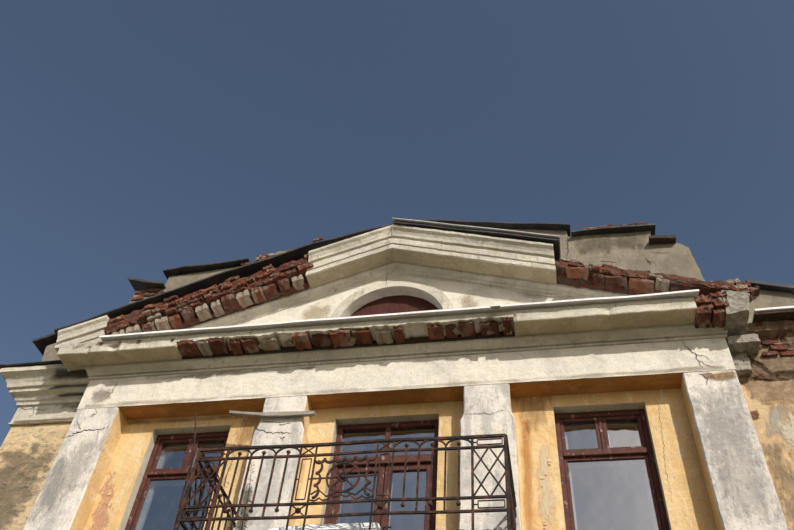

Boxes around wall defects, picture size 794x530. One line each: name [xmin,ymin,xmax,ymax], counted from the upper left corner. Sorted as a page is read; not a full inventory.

water stain [51,369,88,407]
crack [66,383,117,438]
crack [684,343,719,383]
flaking render [743,340,794,450]
peeling [88,472,115,530]